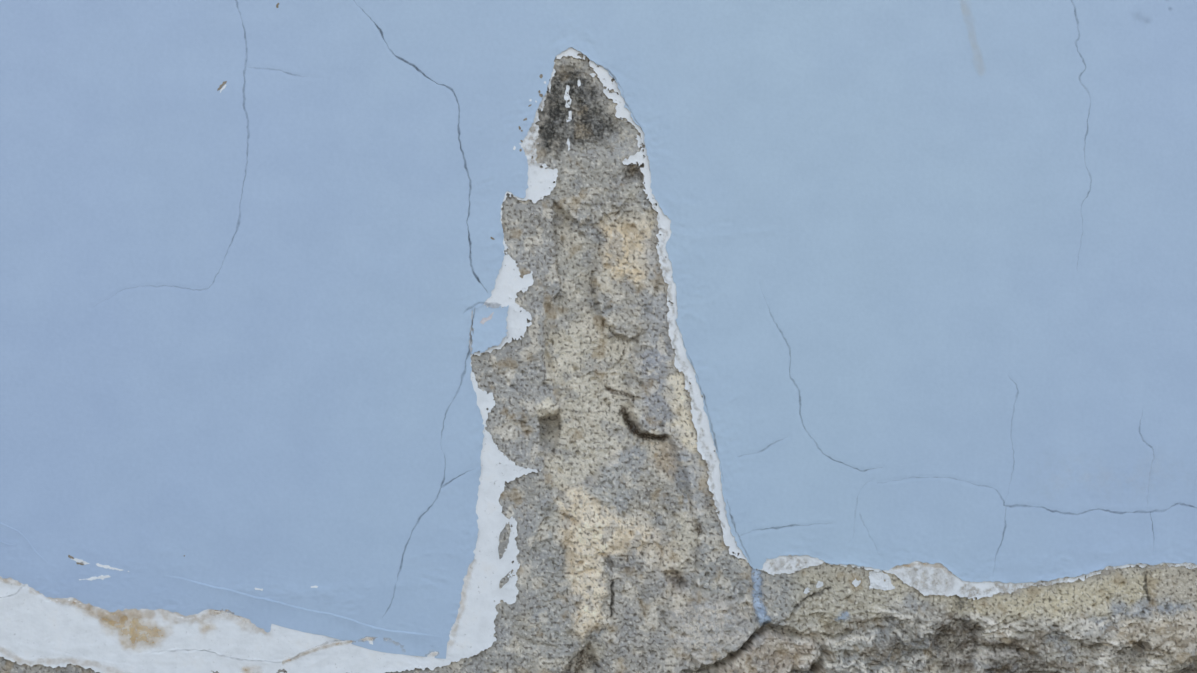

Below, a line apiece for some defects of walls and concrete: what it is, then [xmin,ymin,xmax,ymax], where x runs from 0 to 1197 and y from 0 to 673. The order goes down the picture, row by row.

peeling [0,576,498,673]
spalling [385,48,1197,673]